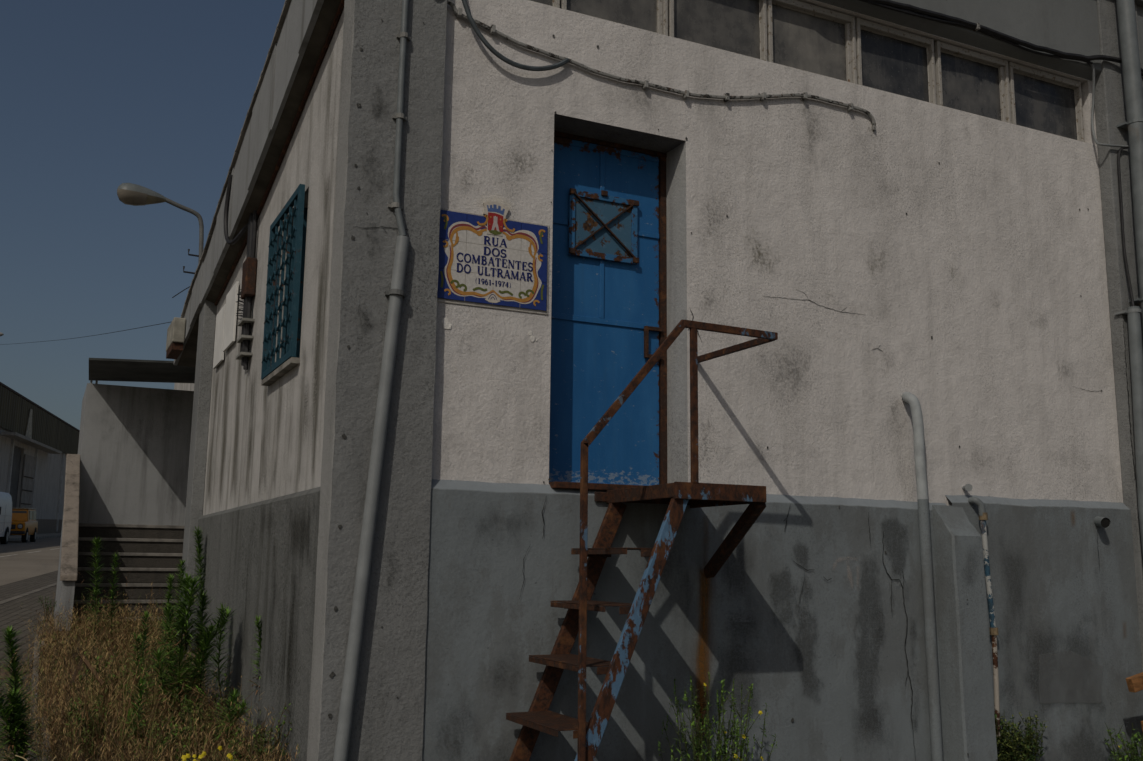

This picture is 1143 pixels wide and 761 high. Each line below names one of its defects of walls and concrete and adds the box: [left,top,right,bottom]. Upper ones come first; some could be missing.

crack [765,289,864,315]
corrosion [697,573,708,754]
crack [868,512,916,760]